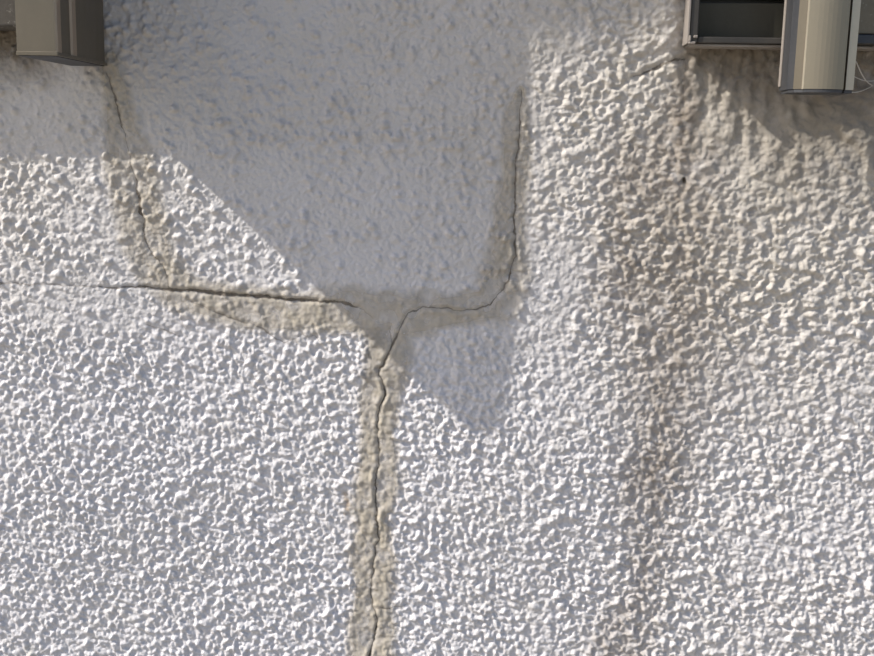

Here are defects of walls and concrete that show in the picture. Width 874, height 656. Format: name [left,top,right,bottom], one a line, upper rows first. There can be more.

crack [106,73,126,135]
crack [106,177,355,307]
crack [369,91,522,656]